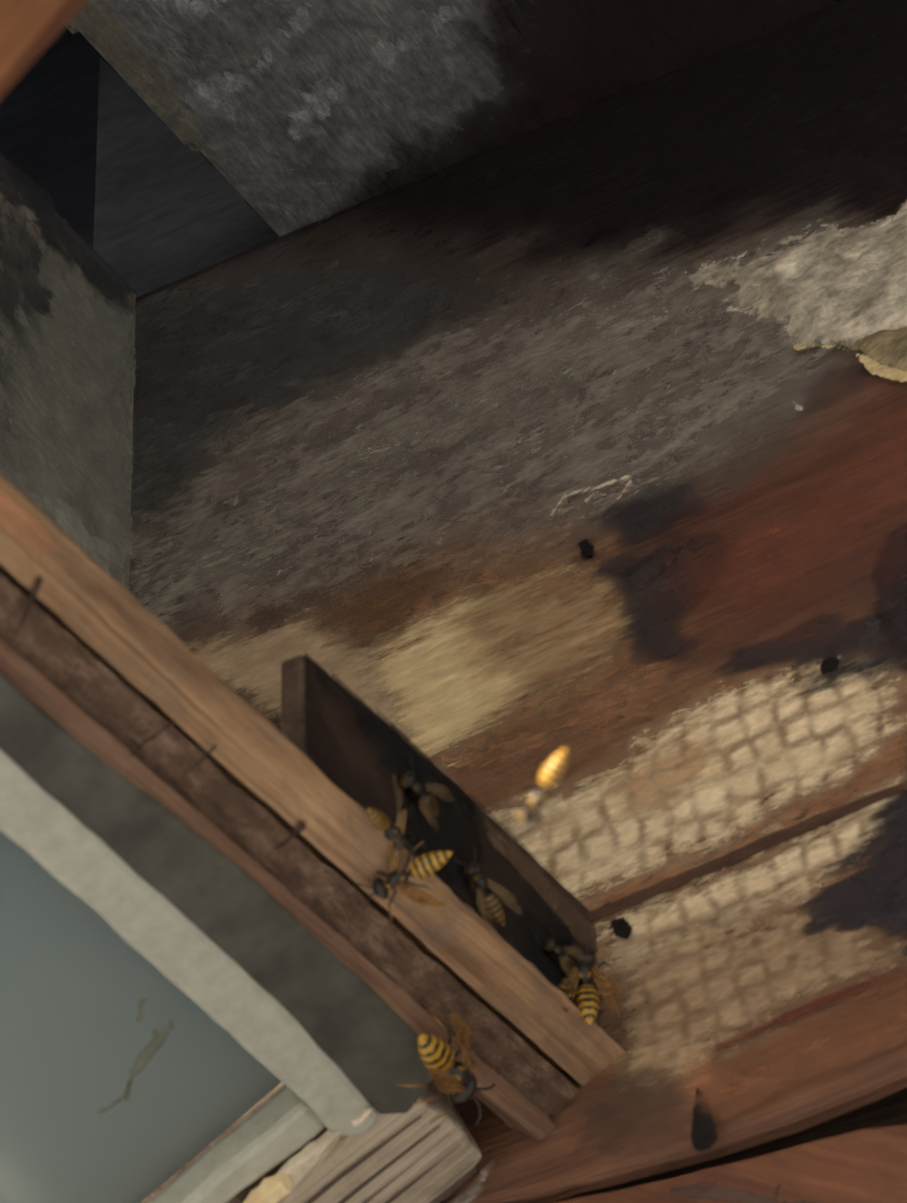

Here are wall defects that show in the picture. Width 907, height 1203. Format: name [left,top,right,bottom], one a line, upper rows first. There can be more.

leakage [0,0,907,671]
peeling [690,265,724,288]
leakage [305,652,437,857]
leakage [426,413,907,993]
leakage [578,700,907,1116]